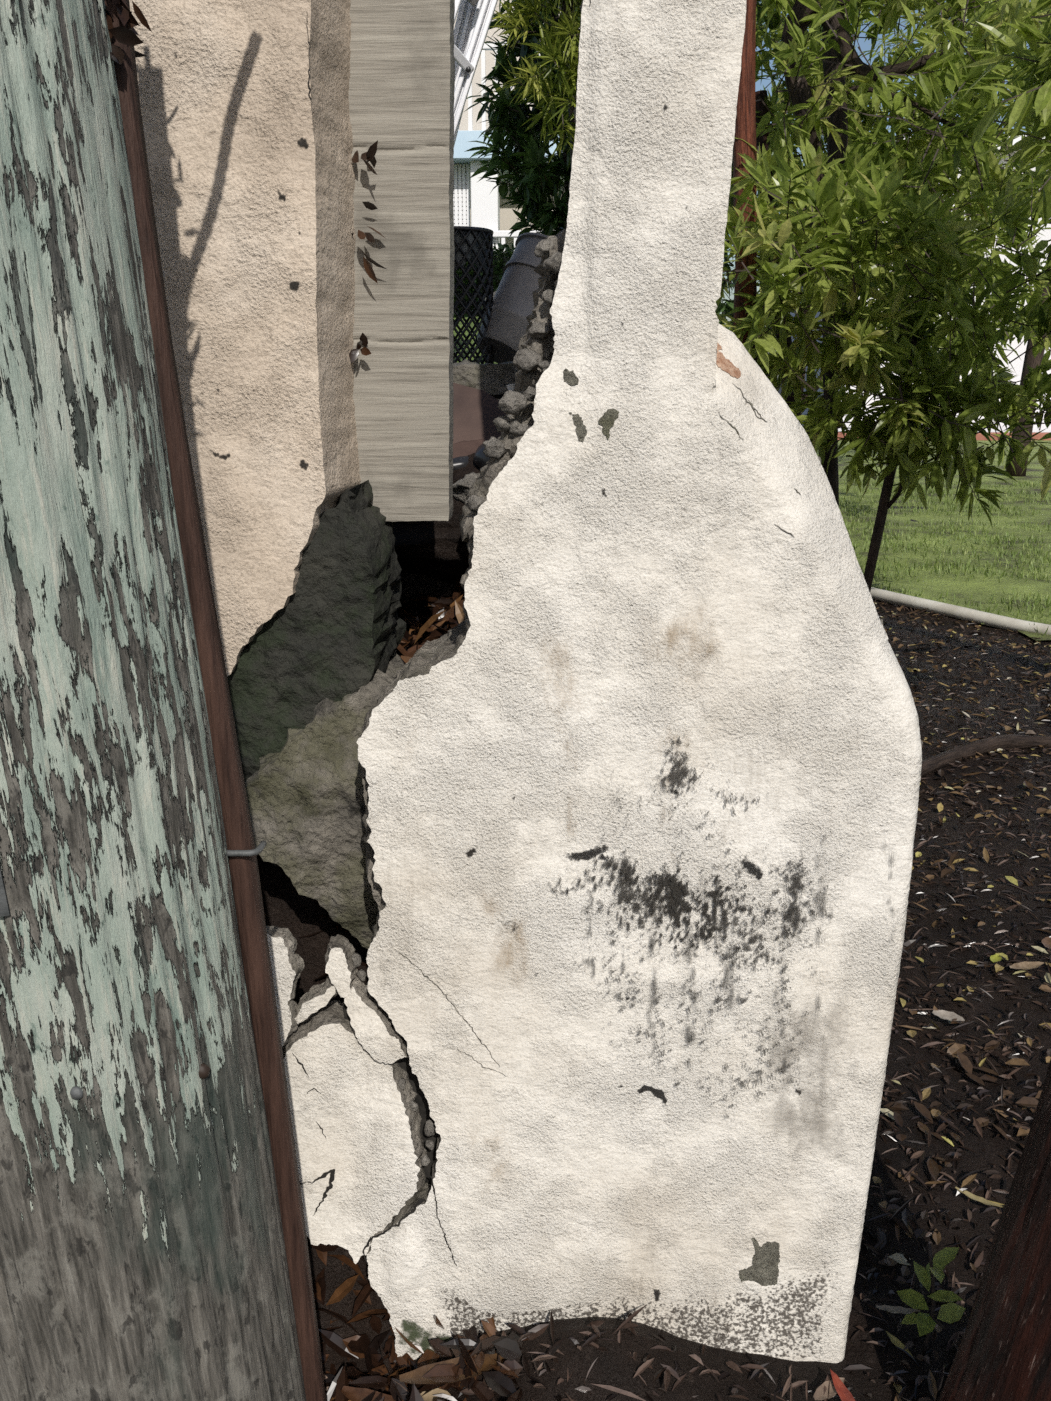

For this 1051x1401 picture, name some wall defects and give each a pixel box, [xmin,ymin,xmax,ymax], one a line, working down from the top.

spalling [427,222,579,663]
peeling [569,409,619,442]
flaking render [266,926,304,1046]
crack [343,953,369,1021]
flaking render [325,934,409,1064]
spalling [360,766,383,940]
crack [398,951,507,1077]
water stain [549,736,836,1122]
crack [292,1053,335,1215]
crack [362,1057,457,1266]